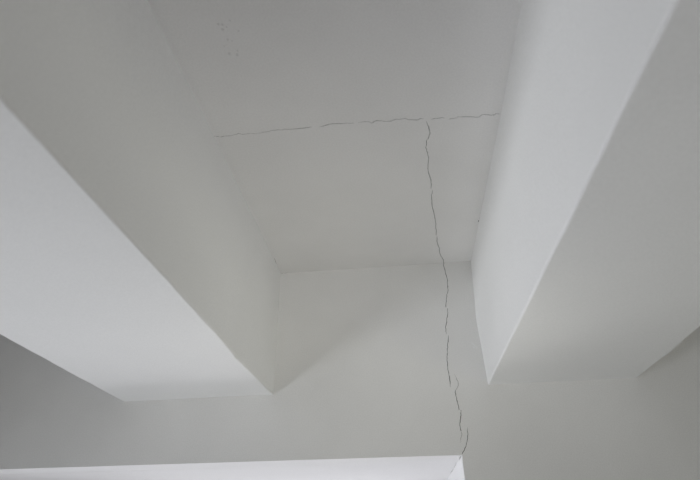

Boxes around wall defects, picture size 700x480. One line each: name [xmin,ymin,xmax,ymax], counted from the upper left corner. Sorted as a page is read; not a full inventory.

crack [216,113,500,473]